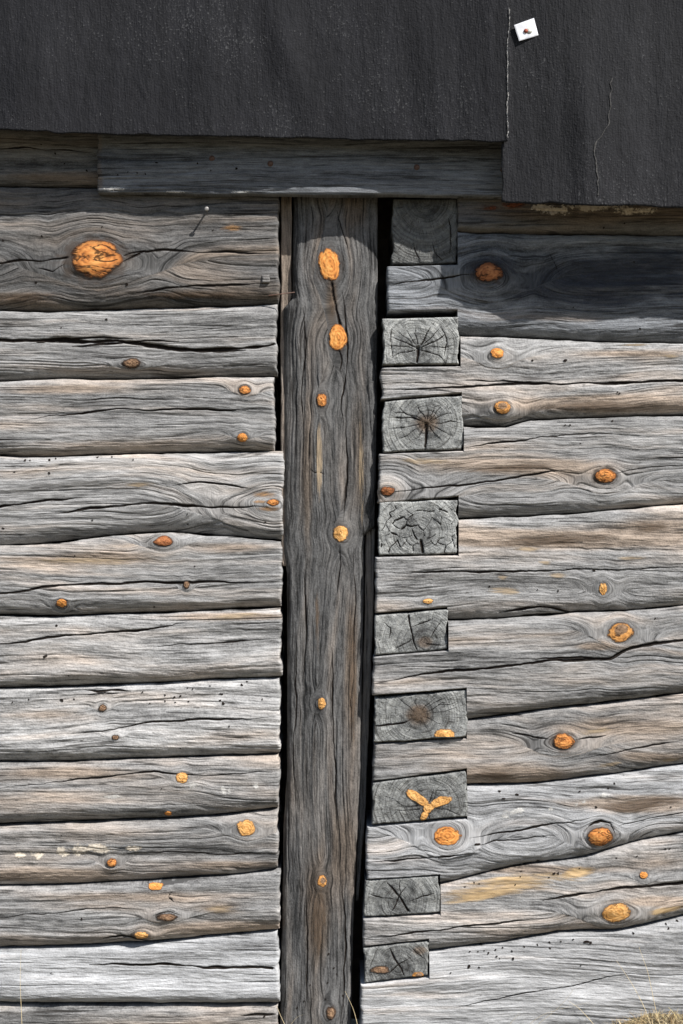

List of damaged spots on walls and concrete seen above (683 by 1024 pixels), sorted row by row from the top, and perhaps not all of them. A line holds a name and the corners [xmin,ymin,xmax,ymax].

crack [594,78,613,195]
crack [0,257,67,272]
crack [124,249,276,261]
crack [132,283,264,294]
crack [0,336,275,353]
crack [389,327,454,363]
crack [332,470,683,818]
crack [341,812,683,1014]
crack [302,892,310,1005]